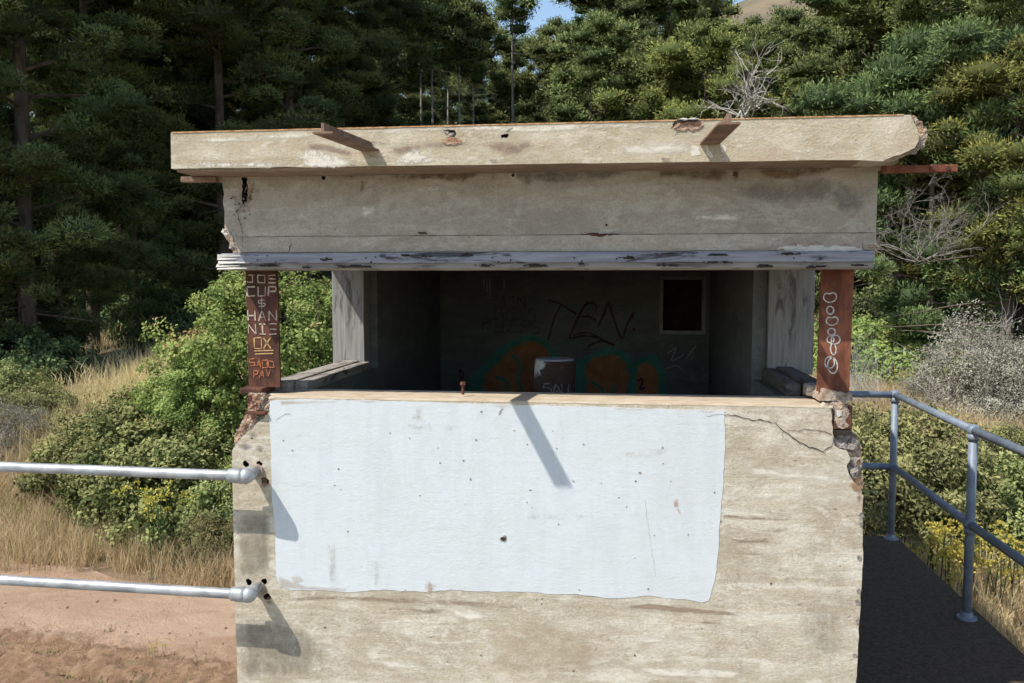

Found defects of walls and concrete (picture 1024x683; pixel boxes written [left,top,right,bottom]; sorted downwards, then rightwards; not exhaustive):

spalling [671,118,703,131]
spalling [893,115,928,158]
spalling [221,228,237,253]
spalling [234,392,272,447]
crack [712,414,834,454]
spalling [826,400,864,493]